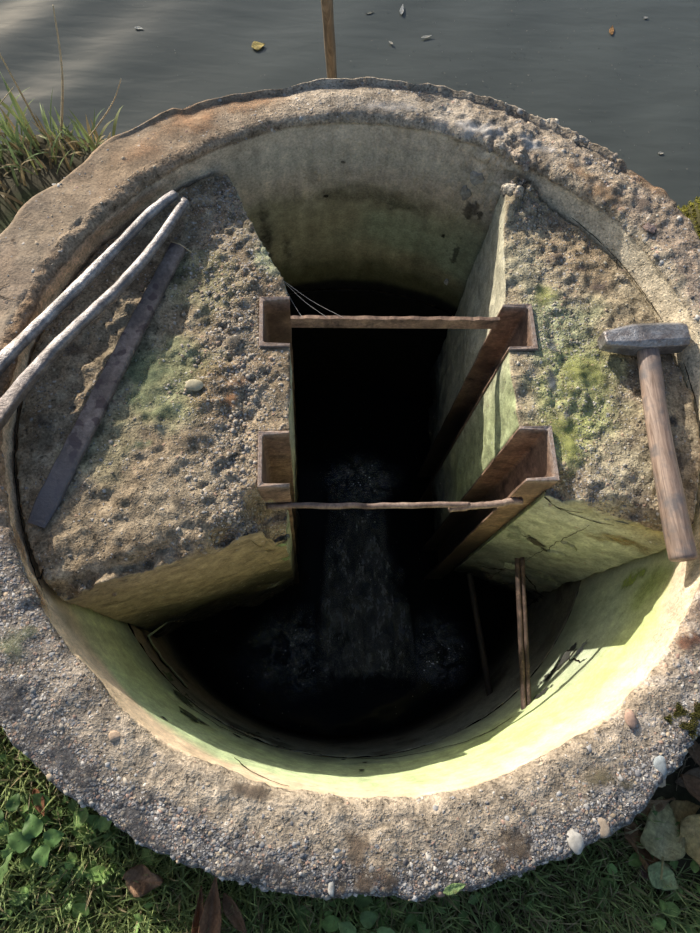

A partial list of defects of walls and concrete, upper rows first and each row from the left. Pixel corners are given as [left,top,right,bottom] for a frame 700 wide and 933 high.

crack [483,497,614,606]